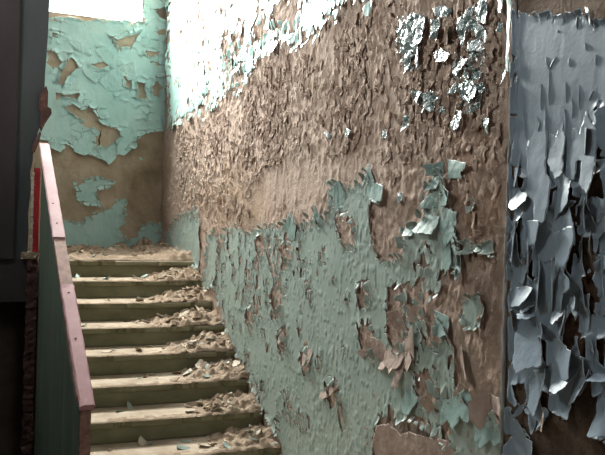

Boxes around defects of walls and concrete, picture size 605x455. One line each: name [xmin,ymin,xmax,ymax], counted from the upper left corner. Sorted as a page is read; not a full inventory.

flaking render [49,12,95,21]
flaking render [517,0,605,23]
flaking render [111,33,140,50]
flaking render [46,49,62,69]
flaking render [58,57,79,86]
flaking render [137,81,147,99]
flaking render [66,103,122,148]
flaking render [27,132,49,252]
peeling [72,175,116,208]
flaking render [587,163,604,200]
peeling [63,198,128,248]
flaking render [505,302,605,455]